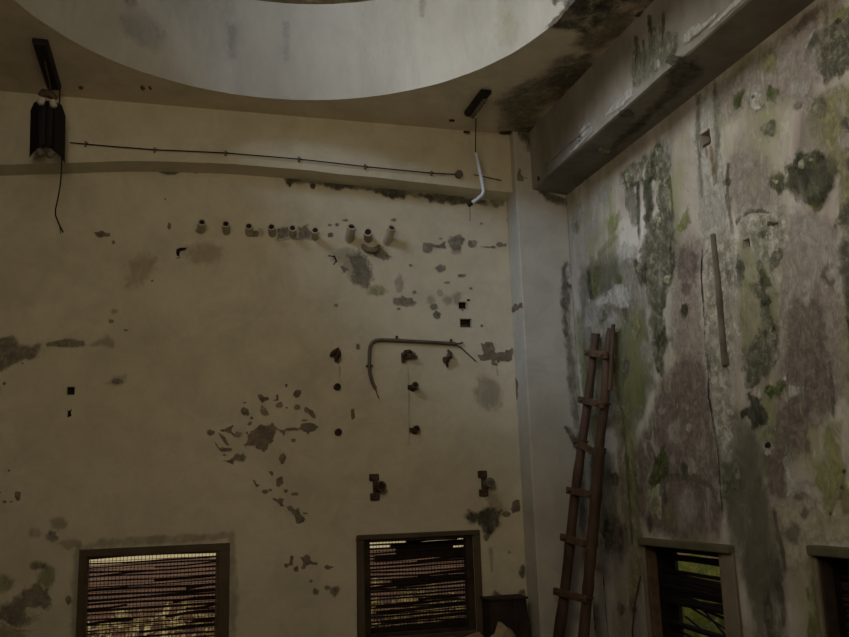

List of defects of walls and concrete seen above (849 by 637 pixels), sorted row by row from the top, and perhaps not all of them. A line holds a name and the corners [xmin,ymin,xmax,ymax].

damp [499,0,741,154]
damp [804,8,849,83]
damp [286,178,503,207]
damp [693,80,734,240]
peeling [328,247,390,295]
damp [834,198,849,333]
peeling [478,342,513,366]
crack [701,249,723,513]
peeling [207,384,318,464]
damp [560,242,815,637]
peeling [253,471,308,524]
peeling [284,554,333,572]